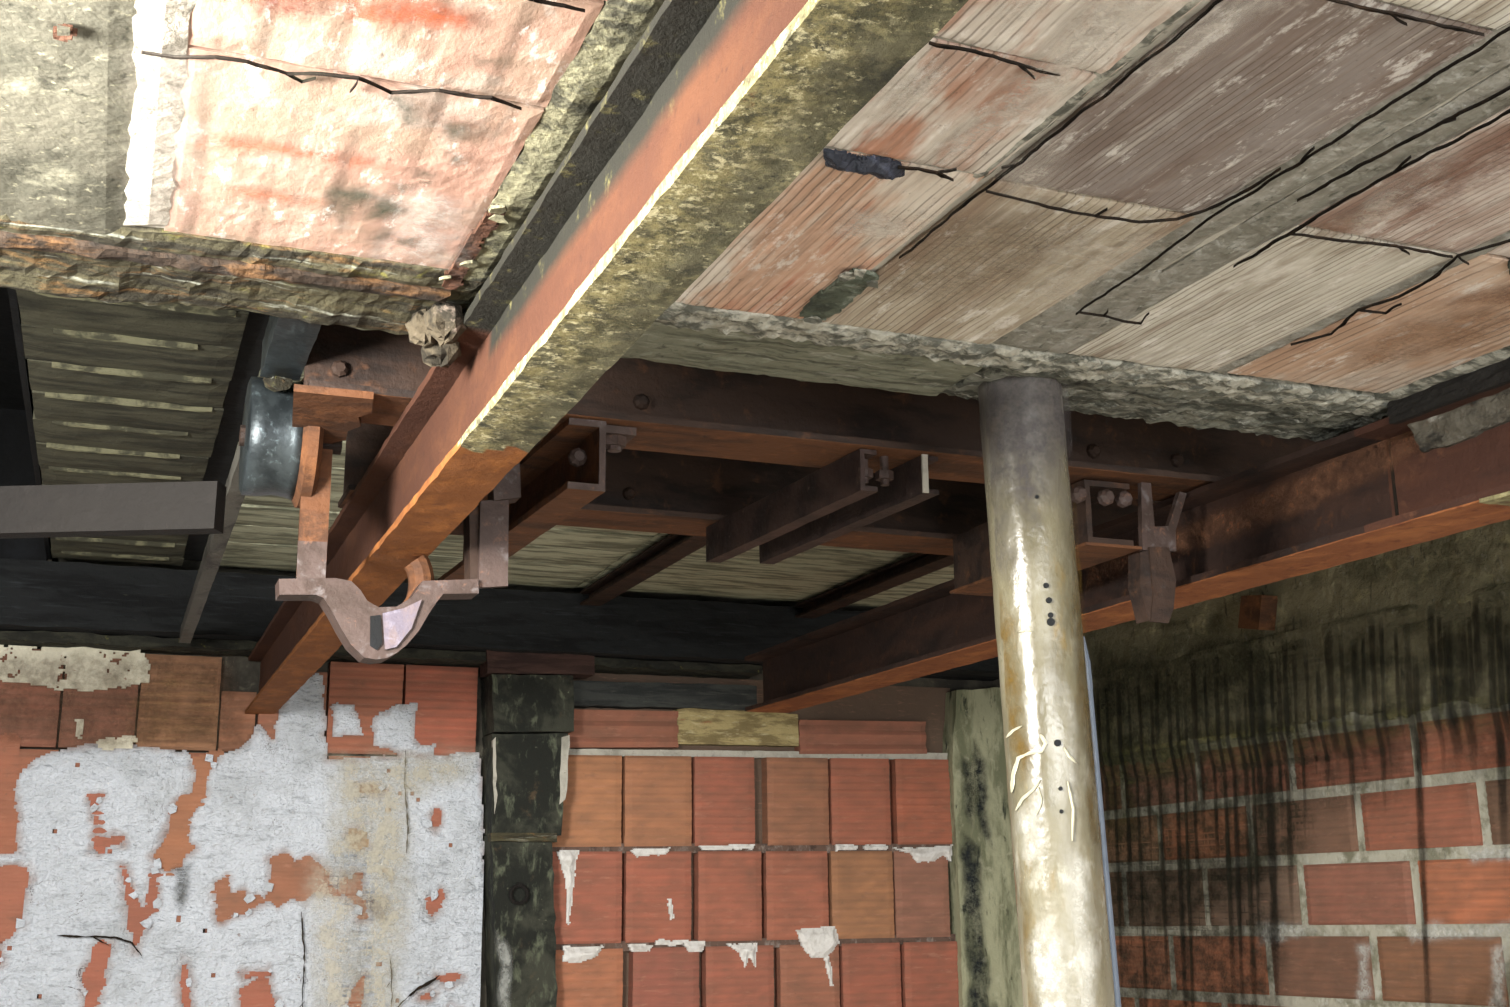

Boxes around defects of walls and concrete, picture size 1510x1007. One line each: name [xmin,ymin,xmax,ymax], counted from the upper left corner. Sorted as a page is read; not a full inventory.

crack [529,0,585,12]
crack [141,50,522,110]
crack [898,0,1510,346]
rust [1176,430,1418,551]
flaking render [0,733,29,964]
flaking render [86,749,224,946]
flaking render [210,854,369,922]
leakage [961,755,989,1007]
leakage [1095,603,1510,1007]
flaking render [82,939,111,1007]
flaking render [237,968,285,1007]
leakage [498,943,511,1007]